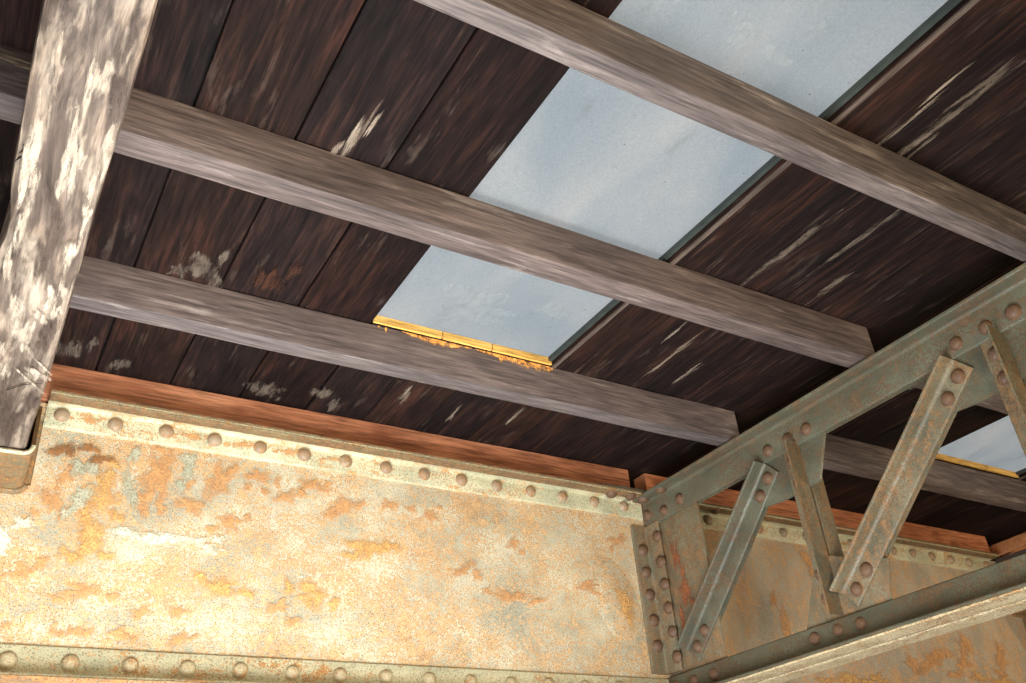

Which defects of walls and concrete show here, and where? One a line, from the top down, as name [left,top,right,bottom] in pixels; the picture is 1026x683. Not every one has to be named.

corrosion [49,393,641,499]
corrosion [0,442,365,580]
corrosion [383,499,443,521]
corrosion [763,516,802,527]
corrosion [340,539,401,562]
corrosion [895,539,999,559]
corrosion [44,583,119,604]
corrosion [266,579,341,627]
corrosion [448,561,545,605]
corrosion [50,622,94,638]
corrosion [108,606,153,643]
corrosion [904,634,1016,683]